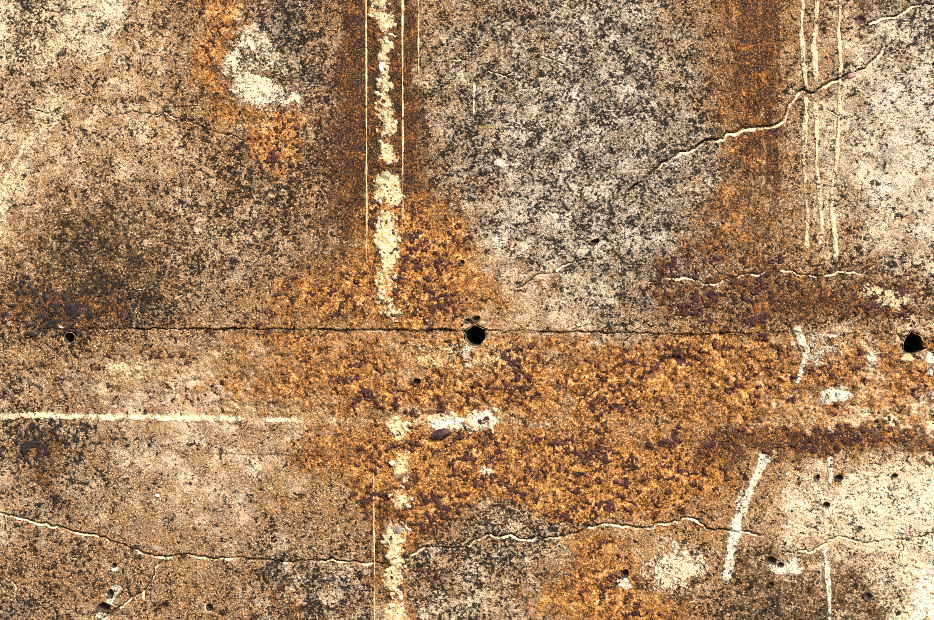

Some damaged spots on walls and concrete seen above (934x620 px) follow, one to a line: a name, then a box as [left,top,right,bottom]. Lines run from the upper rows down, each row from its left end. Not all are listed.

corrosion [185,0,308,184]
crack [627,3,934,192]
leakage [799,0,843,265]
corrosion [97,336,215,409]
crack [95,325,453,333]
crack [516,248,592,289]
corrosion [214,0,934,620]
crack [487,328,679,336]
crack [667,261,877,286]
crack [0,454,766,620]
leakage [713,454,907,620]
crack [780,532,932,559]